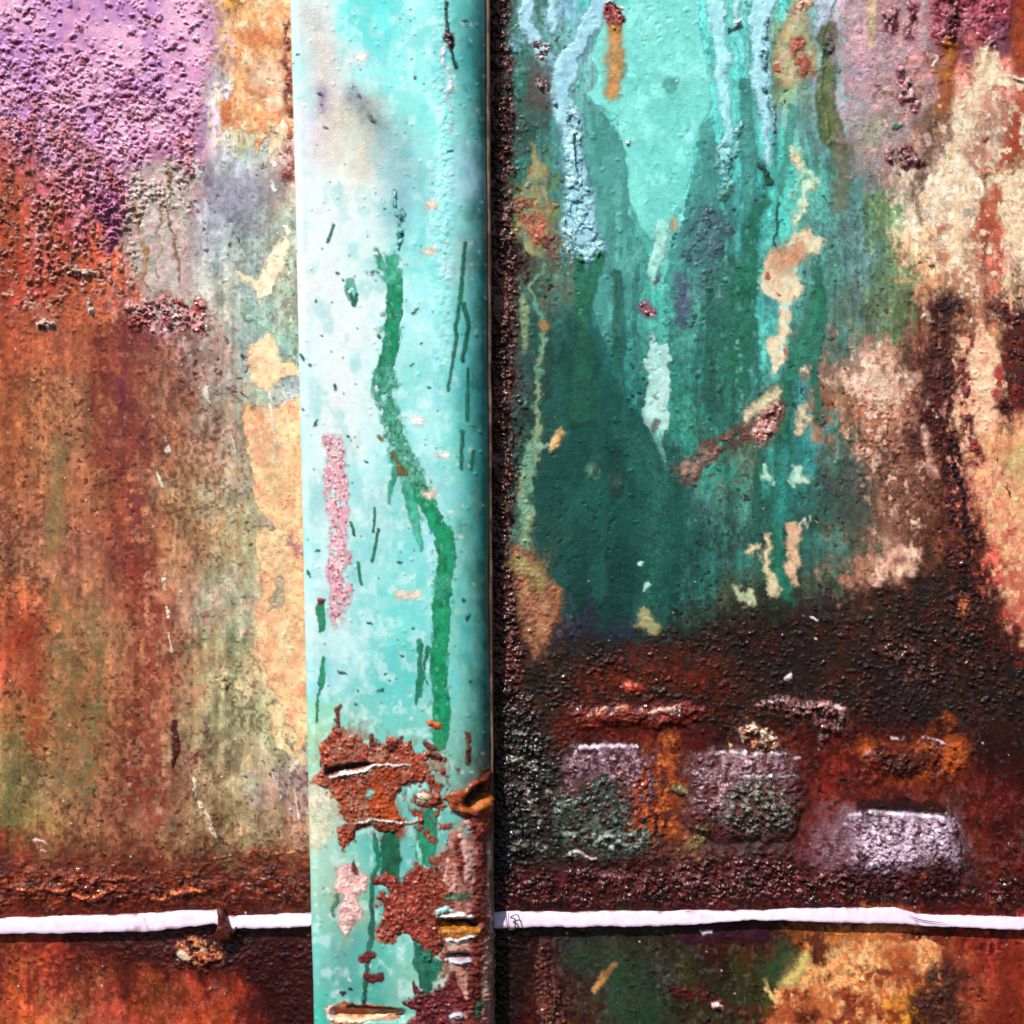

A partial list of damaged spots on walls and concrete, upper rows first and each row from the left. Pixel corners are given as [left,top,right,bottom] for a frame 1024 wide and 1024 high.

corrosion [47,211,71,312]
peeling [758,145,824,374]
corrosion [490,0,1024,911]
corrosion [89,294,218,826]
peeling [308,776,337,852]
corrosion [0,846,311,968]
peeling [331,860,369,937]
peeling [435,812,496,1024]
corrosion [499,930,571,1024]
corrosion [907,956,968,1024]